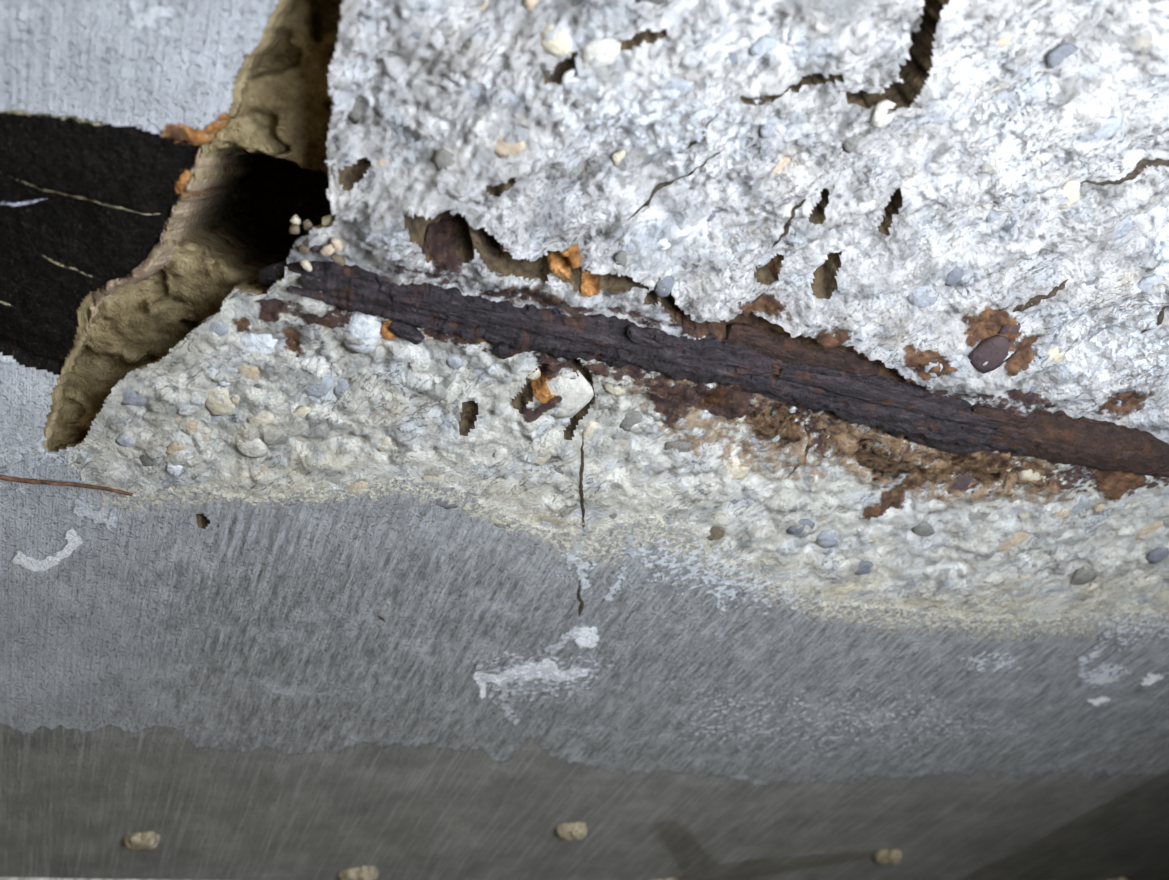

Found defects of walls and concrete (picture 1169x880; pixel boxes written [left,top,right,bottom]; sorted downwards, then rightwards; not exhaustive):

crack [628,0,950,220]
spalling [64,0,1169,622]
rust [232,218,1169,521]
leakage [0,428,91,512]
leakage [464,626,614,724]
crack [576,441,585,616]
leakage [0,723,1169,880]
leakage [11,477,1169,706]
leakage [671,679,1049,761]